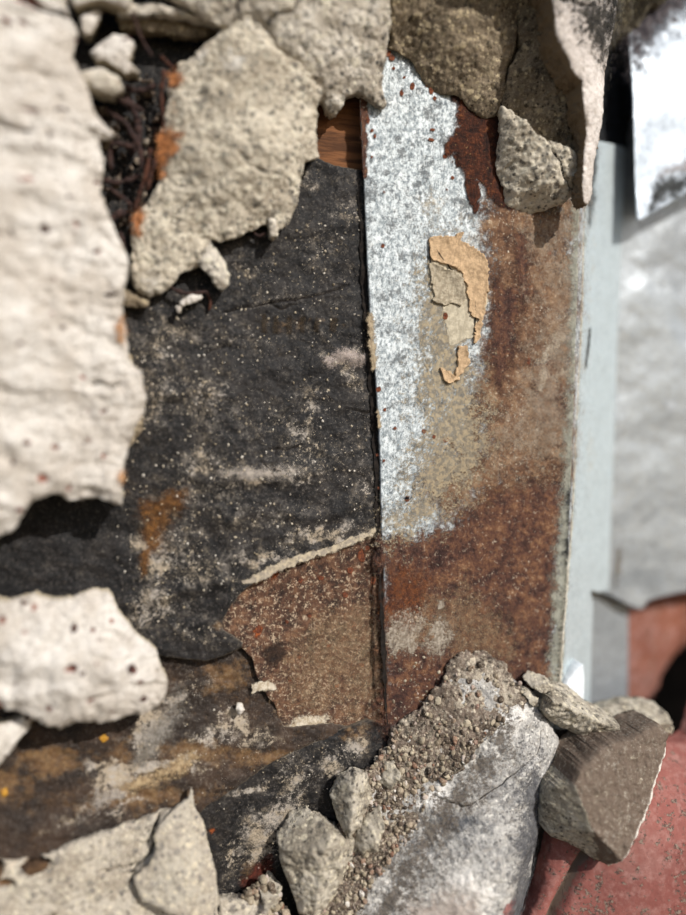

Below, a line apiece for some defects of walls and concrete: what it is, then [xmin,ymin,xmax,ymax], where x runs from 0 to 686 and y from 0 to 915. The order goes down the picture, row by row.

crack [268,0,298,21]
rust [386,44,415,96]
damp [554,0,666,87]
rust [155,125,185,179]
rust [131,207,144,237]
peeling [428,232,490,384]
rust [222,95,588,742]
rust [140,489,188,575]
crack [443,730,542,807]
peeling [134,787,219,915]